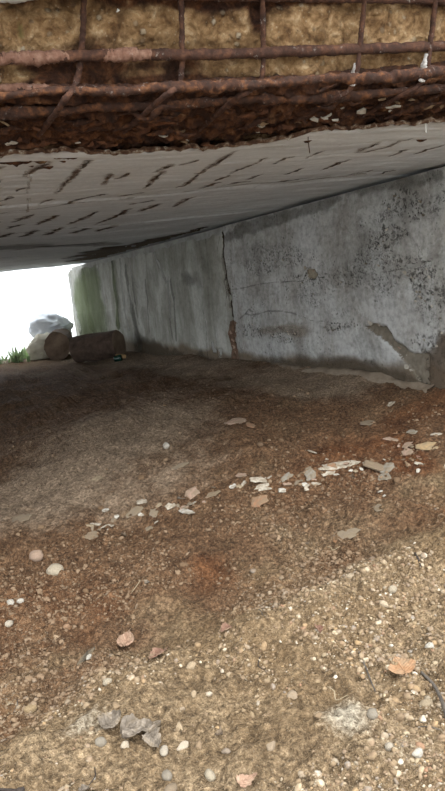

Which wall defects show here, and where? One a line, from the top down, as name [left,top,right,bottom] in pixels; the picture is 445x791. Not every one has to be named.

spalling [0,0,445,170]
crack [222,232,234,317]
spalling [366,320,445,384]